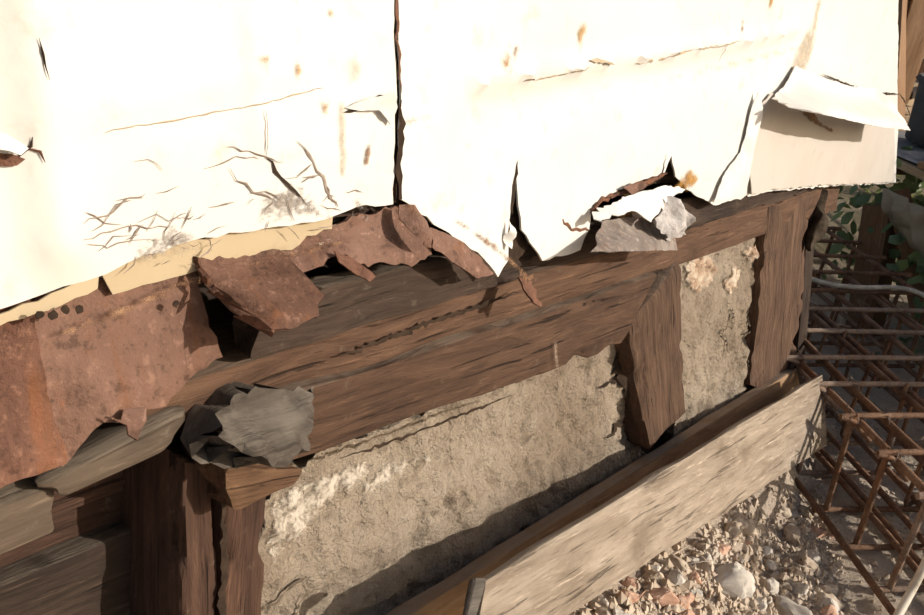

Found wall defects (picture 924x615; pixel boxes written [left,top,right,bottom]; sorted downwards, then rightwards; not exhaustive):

crack [345,0,406,202]
crack [84,88,368,273]
peeling [623,180,648,195]
peeling [502,220,517,249]
corrosion [477,235,542,307]
peeling [685,256,741,294]
peeling [744,246,759,261]
corrosion [0,204,494,488]
crack [340,393,516,459]